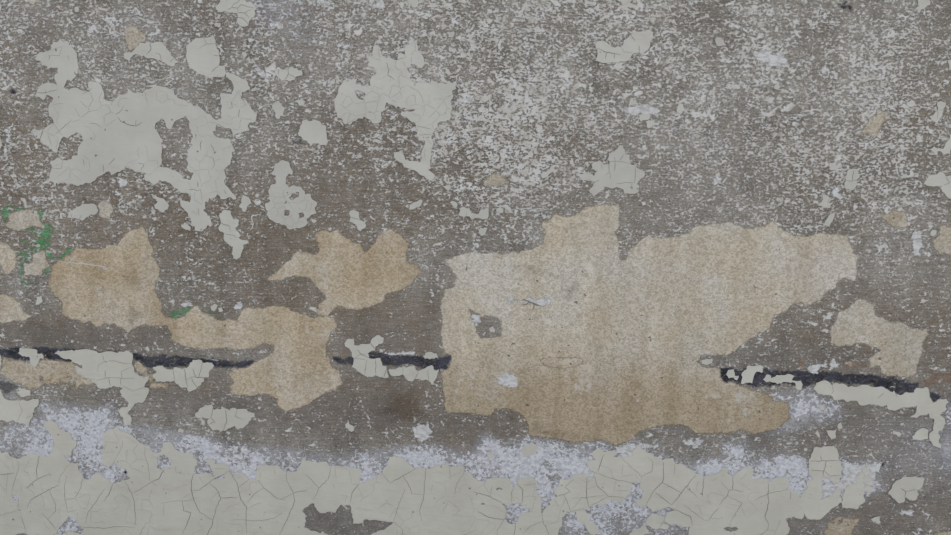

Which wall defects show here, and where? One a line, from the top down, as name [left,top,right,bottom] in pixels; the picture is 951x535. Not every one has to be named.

peeling [33,0,257,259]
leakage [0,382,16,393]
flaking render [0,145,951,535]
leakage [720,367,918,430]
leakage [0,399,869,524]
leakage [560,482,689,535]